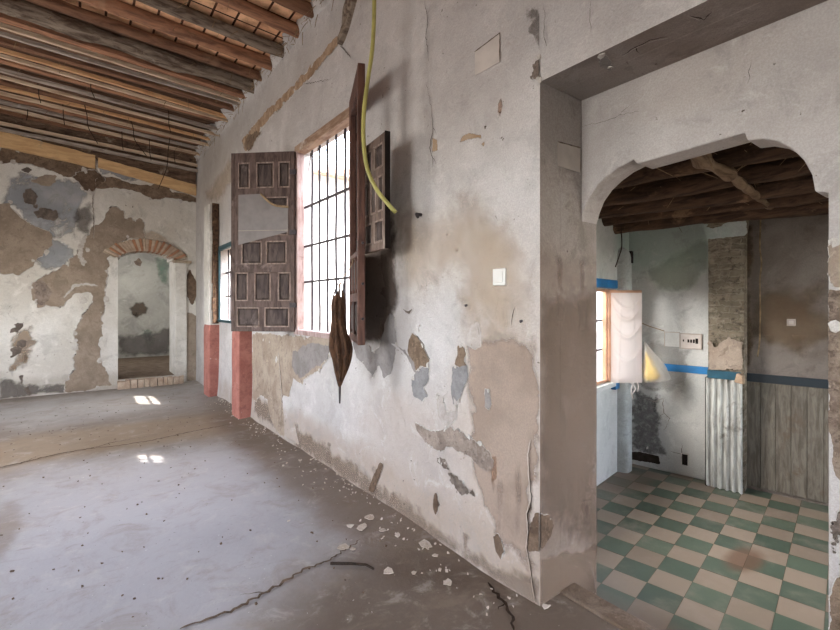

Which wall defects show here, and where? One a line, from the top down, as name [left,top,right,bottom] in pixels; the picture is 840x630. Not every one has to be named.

spalling [242,36,339,153]
peeling [0,148,196,275]
spalling [10,322,26,358]
peeling [28,206,146,393]
peeling [187,270,196,382]
peeling [252,332,331,436]
peeling [391,325,494,497]
damp [632,391,666,454]
spalling [827,238,840,480]
crack [526,441,536,599]
crack [180,539,360,629]
crack [488,582,515,630]